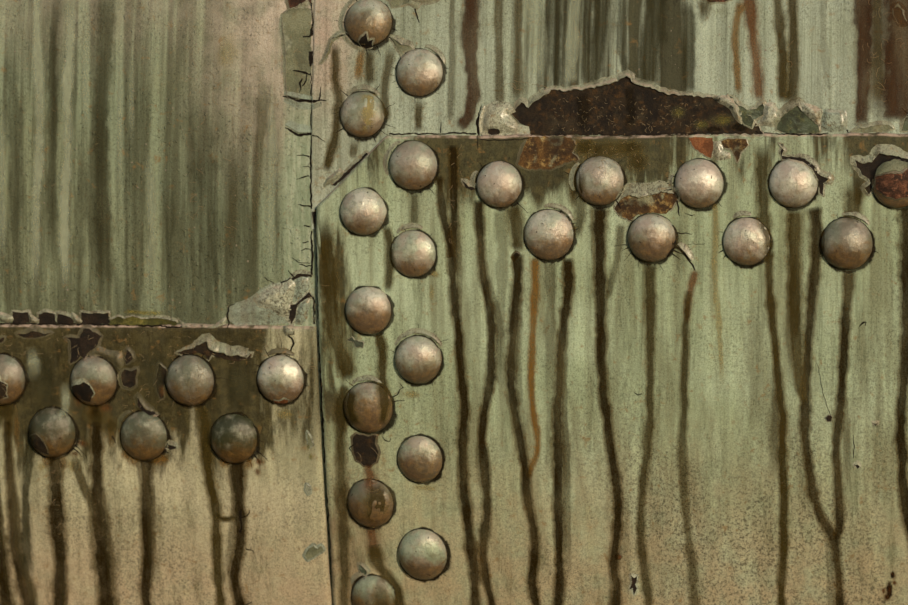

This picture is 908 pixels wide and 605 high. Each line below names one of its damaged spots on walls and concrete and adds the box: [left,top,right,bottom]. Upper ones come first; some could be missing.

rust [459,0,480,128]
rust [853,0,908,122]
peeling [511,69,836,197]
peeling [0,309,179,365]
peeling [175,333,254,361]
crack [254,335,295,372]
peeling [285,290,314,325]
crack [264,0,528,582]
damp [437,146,540,605]
damp [571,176,623,605]
damp [786,208,854,605]
damp [197,406,247,605]